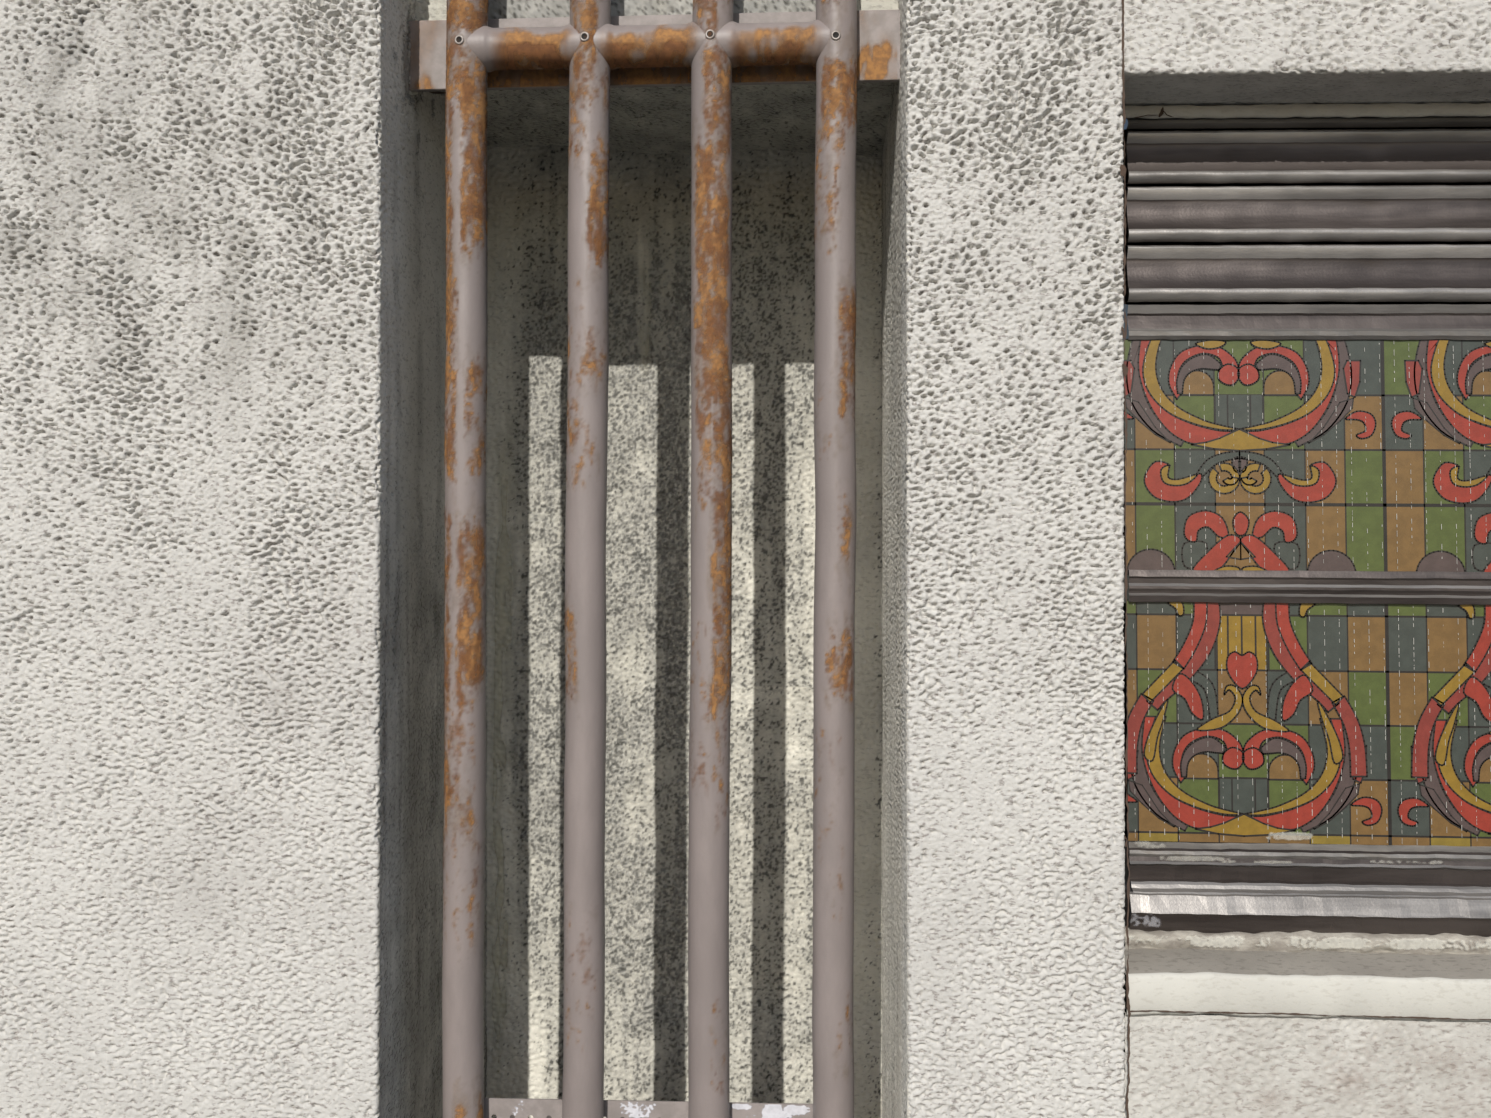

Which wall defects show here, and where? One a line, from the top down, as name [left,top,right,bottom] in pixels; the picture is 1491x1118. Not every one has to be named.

corrosion [444,514,485,827]
water stain [485,113,569,1096]
water stain [604,144,691,1118]
corrosion [415,0,892,738]
water stain [729,152,815,1103]